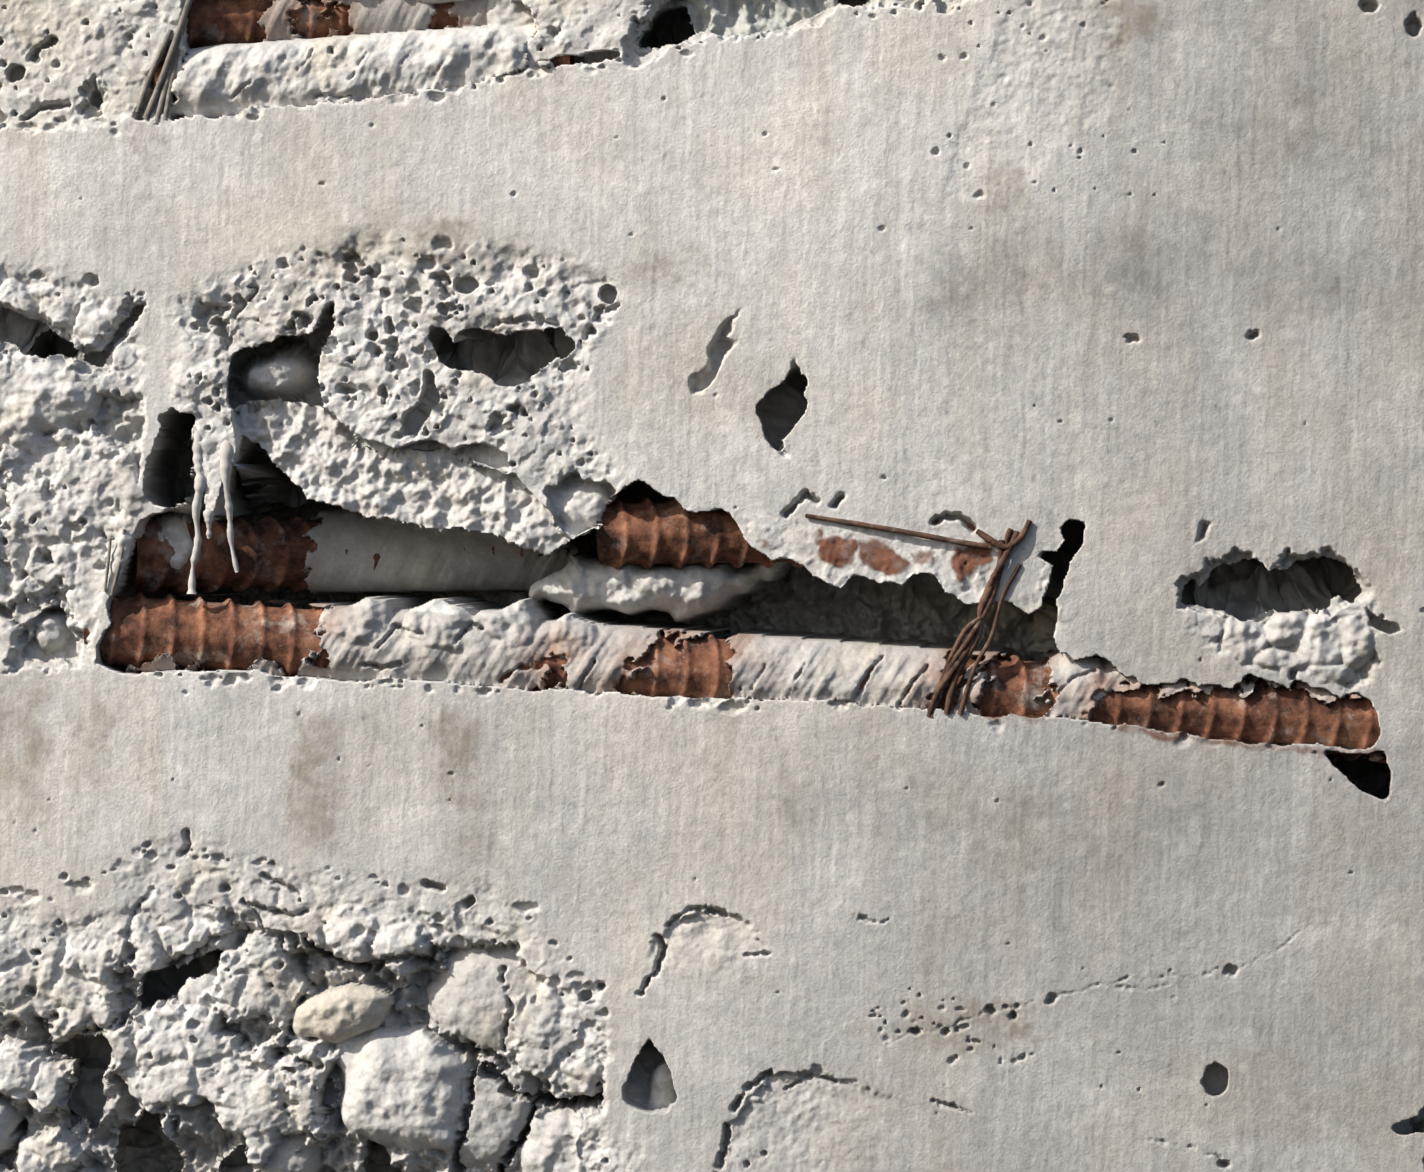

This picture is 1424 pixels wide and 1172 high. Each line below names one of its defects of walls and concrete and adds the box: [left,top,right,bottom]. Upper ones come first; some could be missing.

spalling [183,0,272,62]
spalling [289,0,354,39]
spalling [631,0,962,59]
peeling [939,0,1136,210]
spalling [0,221,1413,801]
corrosion [815,529,931,575]
corrosion [951,541,994,582]
spalling [136,948,225,1011]
spalling [50,1029,193,1172]
spalling [623,1038,677,1114]
spalling [1392,1107,1424,1135]
spalling [216,1137,256,1172]